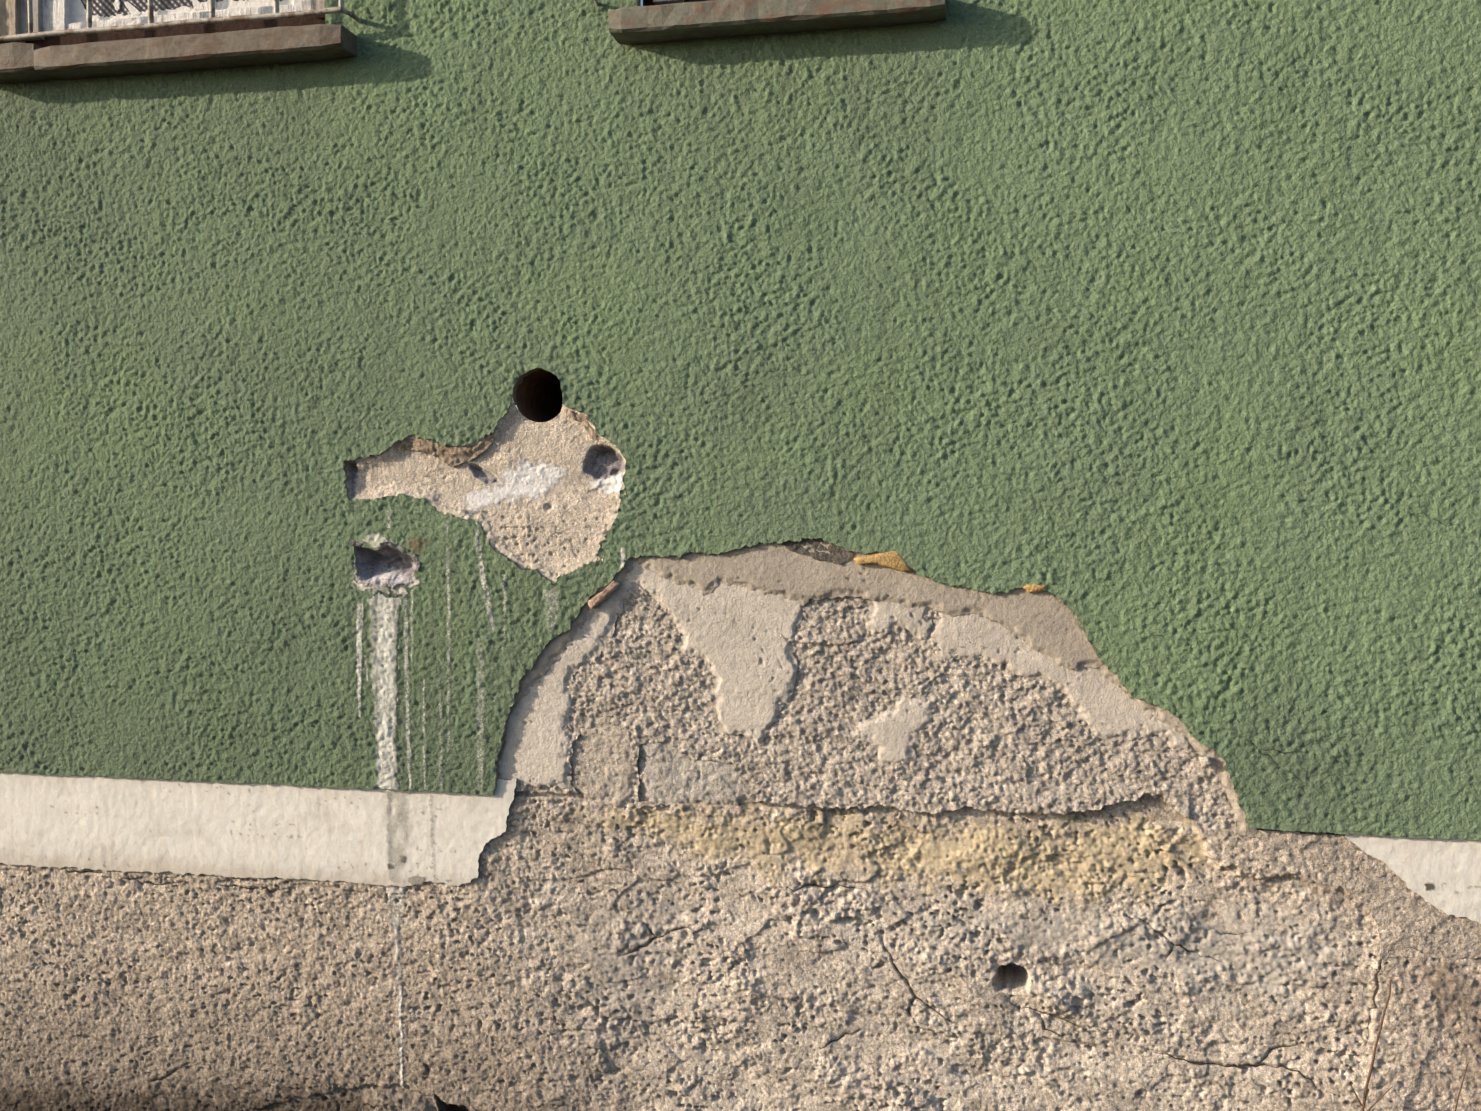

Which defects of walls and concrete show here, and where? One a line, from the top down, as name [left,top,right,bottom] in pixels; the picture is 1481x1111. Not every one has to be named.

flaking render [345,400,629,584]
spalling [349,533,420,596]
damp [356,566,449,866]
flaking render [476,538,1481,1111]
spalling [388,855,425,885]
crack [775,884,866,892]
crack [618,925,697,957]
damp [387,885,406,1099]
crack [873,942,952,1023]
crack [1012,1004,1091,1036]
flaking render [247,1084,470,1111]
crack [1141,1045,1318,1090]